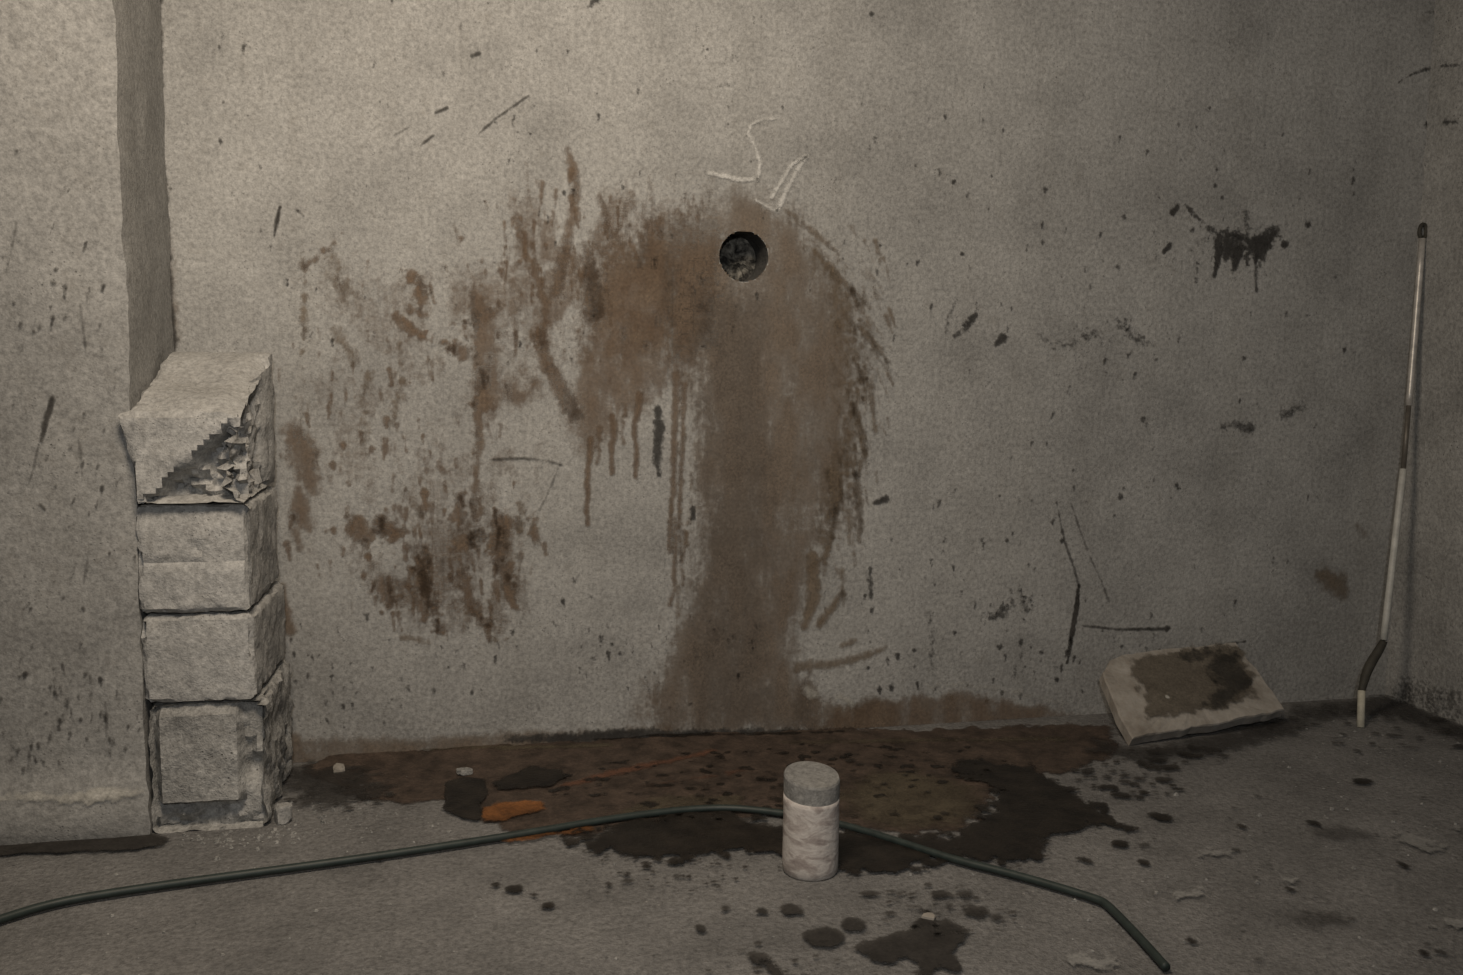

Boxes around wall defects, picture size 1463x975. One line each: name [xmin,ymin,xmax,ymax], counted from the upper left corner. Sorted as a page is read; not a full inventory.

corrosion [285,413,346,560]
corrosion [331,270,545,641]
leakage [282,154,1045,809]
leakage [442,766,566,820]
leakage [491,882,555,908]
leakage [559,781,783,893]
leakage [748,695,1463,975]